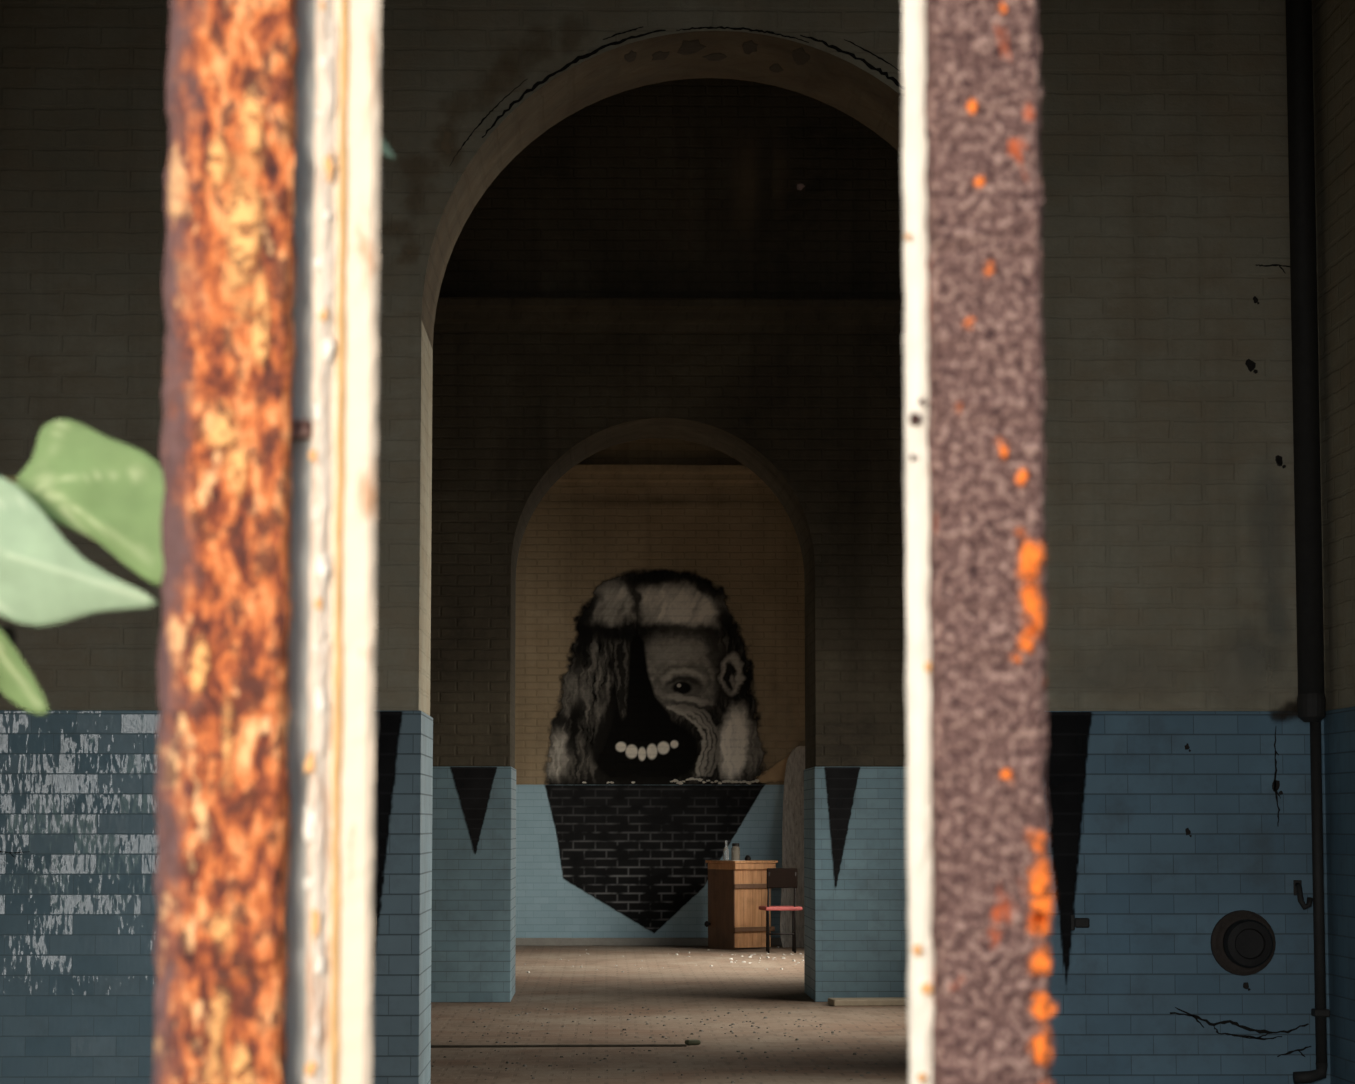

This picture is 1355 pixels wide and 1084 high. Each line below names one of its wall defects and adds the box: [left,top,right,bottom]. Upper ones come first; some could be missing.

corrosion [208,139,229,183]
corrosion [241,96,261,152]
corrosion [226,186,268,362]
corrosion [208,414,245,492]
corrosion [1016,469,1027,485]
corrosion [1012,541,1044,661]
corrosion [190,640,208,689]
crack [1273,728,1281,824]
corrosion [1028,832,1052,974]
corrosion [207,997,252,1084]
corrosion [1031,992,1056,1063]
crack [1170,1007,1311,1057]